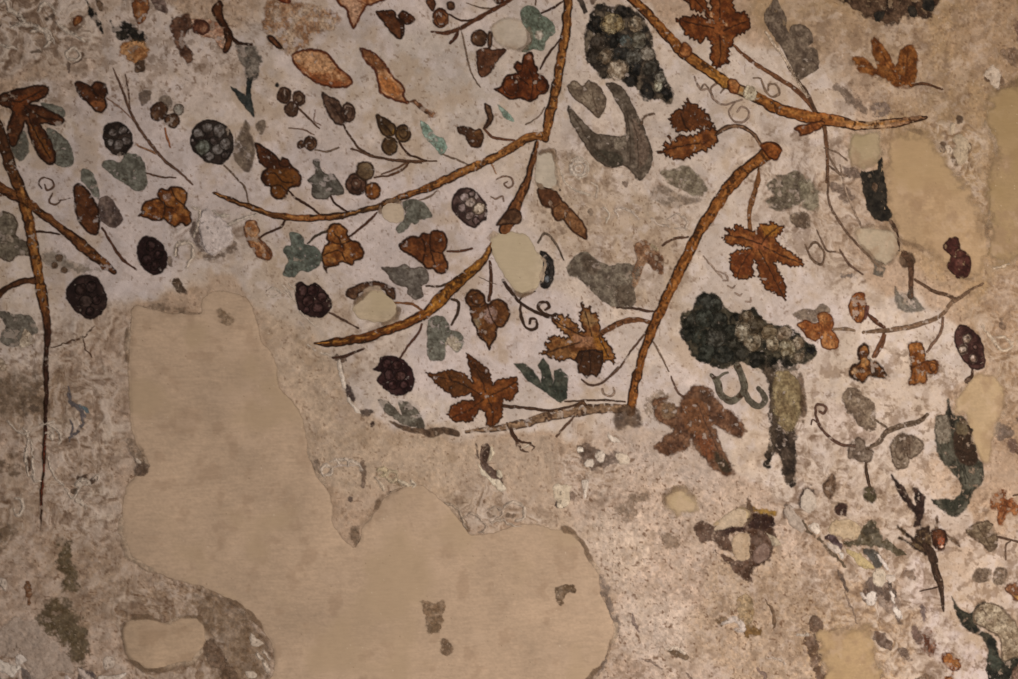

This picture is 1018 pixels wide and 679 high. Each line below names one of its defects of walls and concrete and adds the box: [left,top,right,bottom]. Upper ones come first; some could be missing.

flaking render [984,65,1004,89]
flaking render [849,115,991,281]
flaking render [955,374,1018,463]
flaking render [118,286,618,679]
flaking render [553,433,630,508]
flaking render [694,488,926,644]
flaking render [65,614,257,679]
flaking render [803,616,912,679]